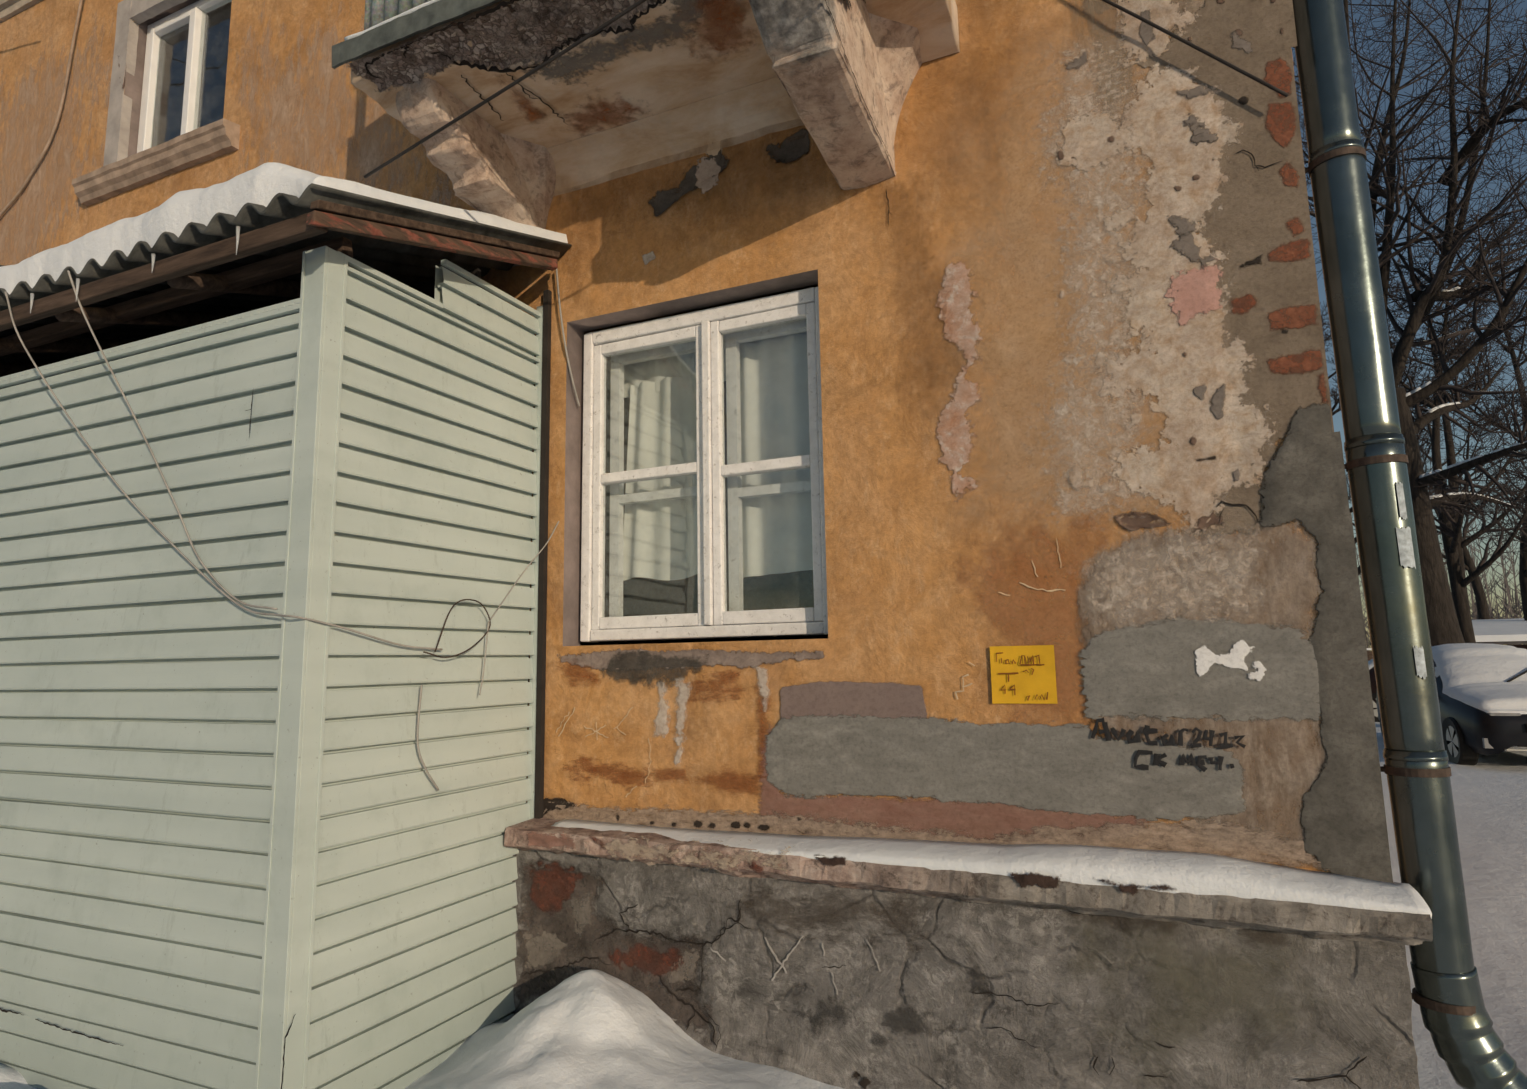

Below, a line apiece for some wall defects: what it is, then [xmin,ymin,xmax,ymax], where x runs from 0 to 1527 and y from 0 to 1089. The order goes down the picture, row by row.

spalling [346,0,665,93]
rust [698,0,752,54]
rust [572,102,640,132]
spalling [766,129,810,164]
spalling [648,150,729,216]
peeling [1040,0,1334,623]
peeling [935,261,983,501]
water stain [602,651,702,764]
water stain [758,667,769,709]
crack [519,899,750,1051]
crack [972,992,1059,1048]
crack [1297,1056,1367,1089]